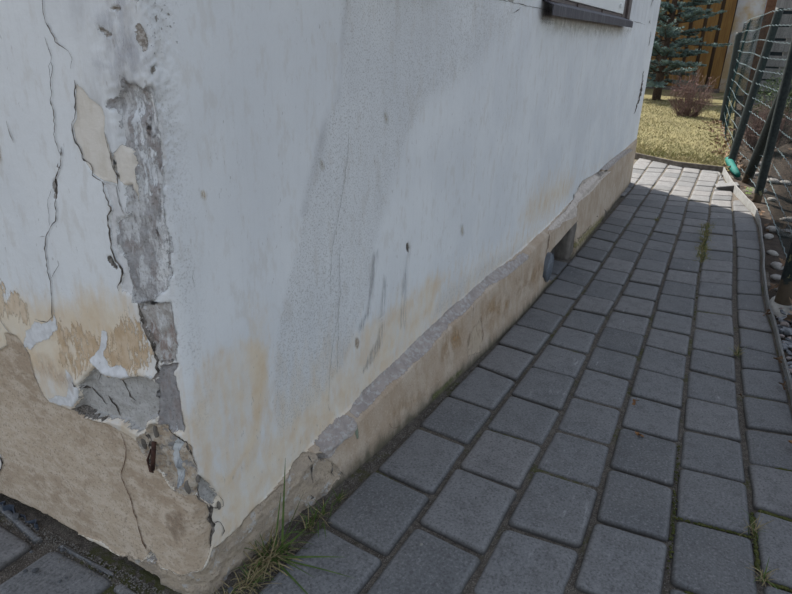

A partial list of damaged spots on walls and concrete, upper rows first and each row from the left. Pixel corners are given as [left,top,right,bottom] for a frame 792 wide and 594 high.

crack [38,1,128,323]
crack [72,374,146,549]
peeling [0,76,529,594]